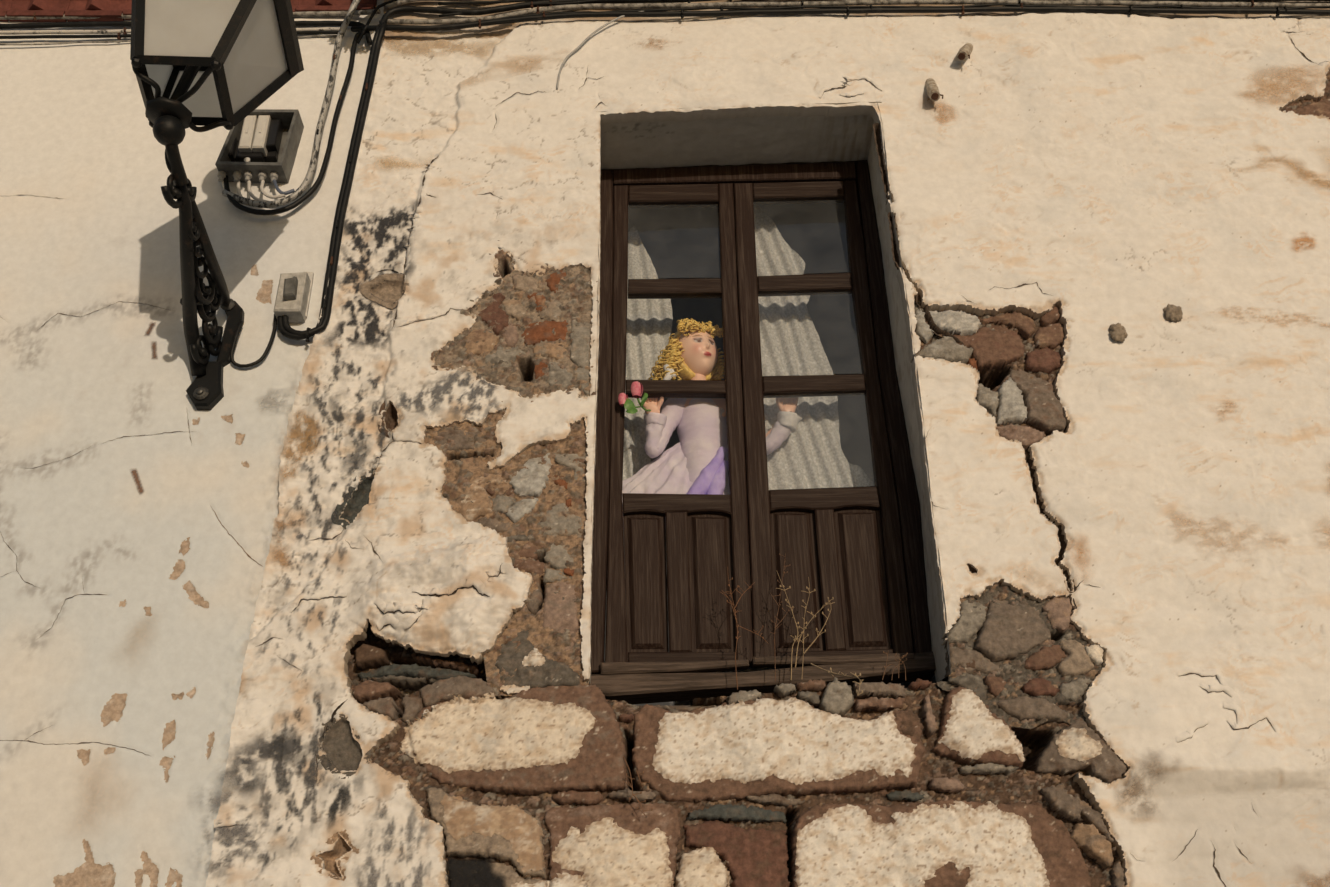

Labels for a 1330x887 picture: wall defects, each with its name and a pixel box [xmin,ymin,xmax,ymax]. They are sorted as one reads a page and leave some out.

spalling [1281,70,1330,119]
crack [817,75,964,345]
water stain [275,206,417,628]
water stain [398,373,496,413]
crack [1,534,105,632]
spalling [310,240,1127,887]
crack [1026,445,1101,609]
crack [1175,666,1280,742]
peeling [53,839,116,887]
peeling [134,851,183,887]
water stain [359,809,422,887]